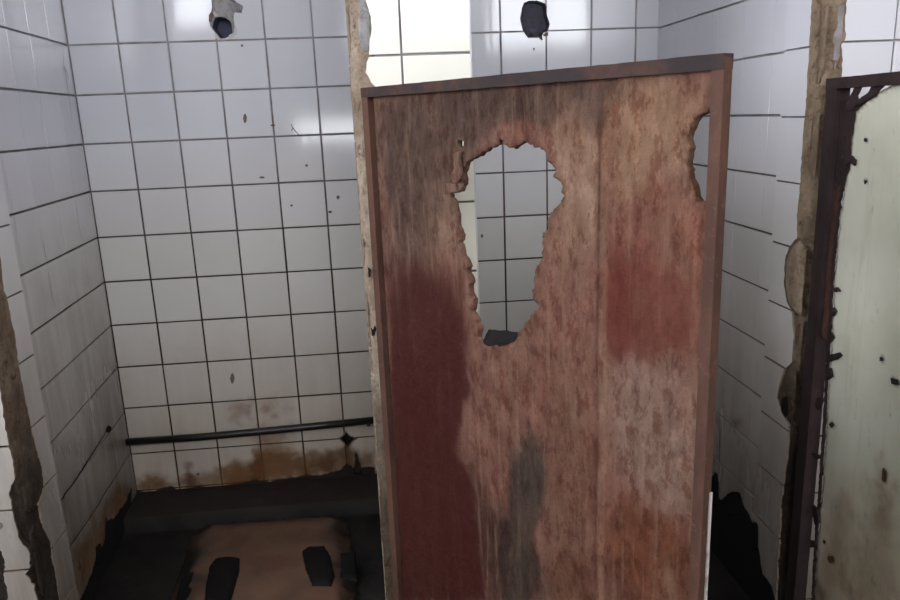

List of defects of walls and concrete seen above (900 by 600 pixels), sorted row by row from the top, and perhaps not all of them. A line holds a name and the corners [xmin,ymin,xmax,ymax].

spalling [209,0,243,47]
hole [520,1,549,50]
flaking render [347,0,394,600]
flaking render [775,0,847,600]
flaking render [0,261,59,600]
damp [226,453,375,486]
damp [80,486,176,600]